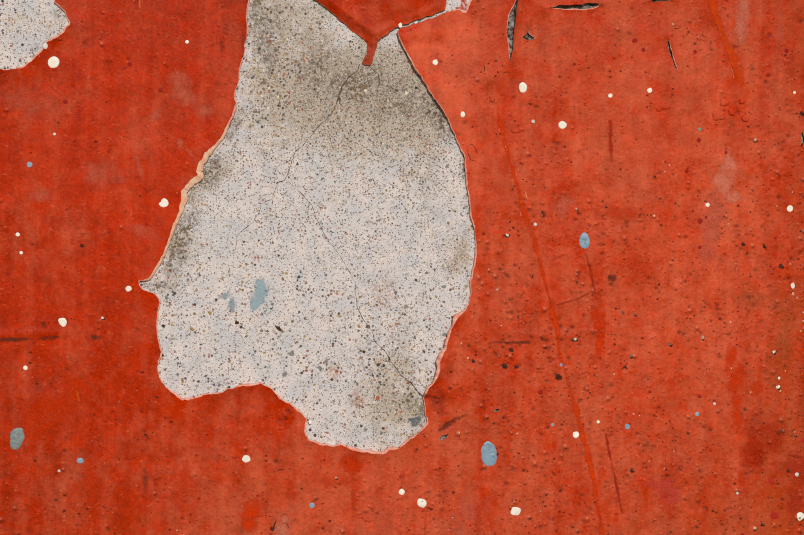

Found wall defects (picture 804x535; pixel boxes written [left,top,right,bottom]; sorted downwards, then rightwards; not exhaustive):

peeling [0,0,70,70]
peeling [138,0,477,454]
crack [234,65,440,399]